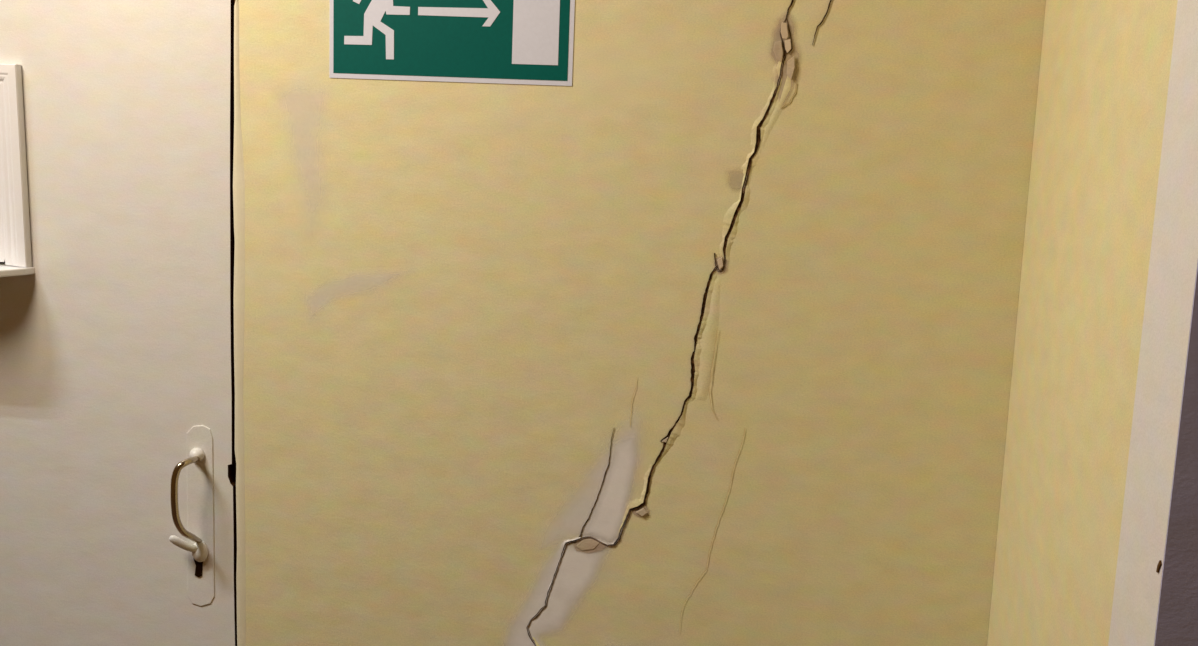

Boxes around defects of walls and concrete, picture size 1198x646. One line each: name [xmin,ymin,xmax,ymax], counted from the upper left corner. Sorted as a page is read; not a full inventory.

spalling [773,16,799,98]
crack [526,0,832,646]
spalling [574,536,608,553]